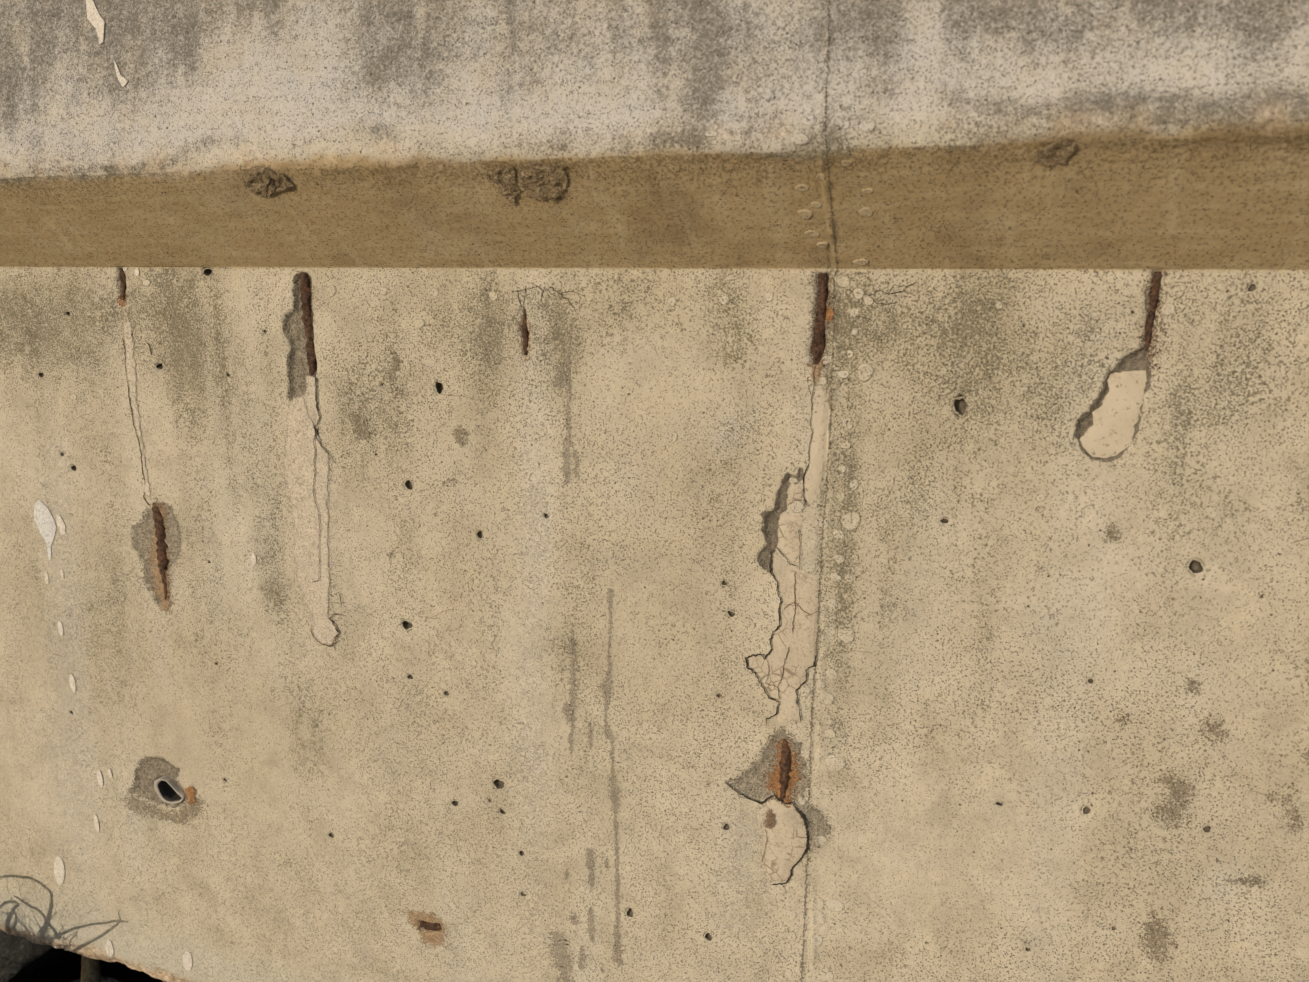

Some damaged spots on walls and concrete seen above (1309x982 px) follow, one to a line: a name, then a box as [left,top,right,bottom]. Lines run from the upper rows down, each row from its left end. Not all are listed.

crack [122,321,152,506]
spalling [282,271,342,647]
corrosion [518,309,531,360]
corrosion [806,270,836,389]
spalling [1073,269,1169,462]
spalling [726,467,834,885]
spalling [124,791,209,827]
corrosion [402,909,446,948]